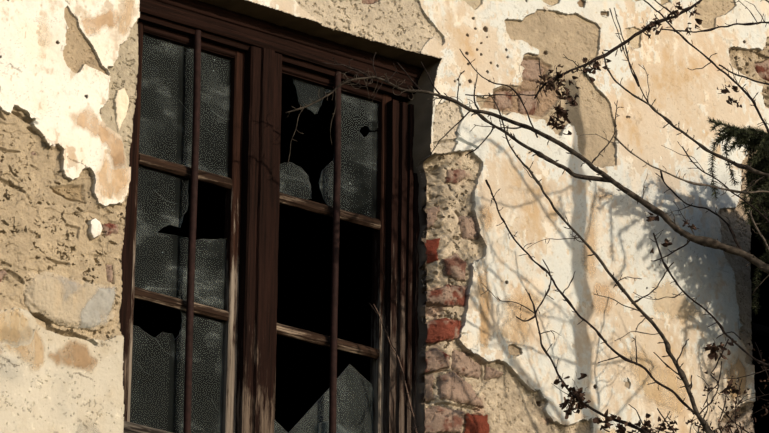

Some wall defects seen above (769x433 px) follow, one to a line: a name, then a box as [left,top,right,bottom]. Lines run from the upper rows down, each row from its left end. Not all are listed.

spalling [56,5,140,168]
spalling [463,0,488,65]
spalling [476,0,619,168]
flaking render [729,36,769,108]
spalling [0,105,129,341]
flaking render [417,96,594,433]
spalling [718,151,759,365]